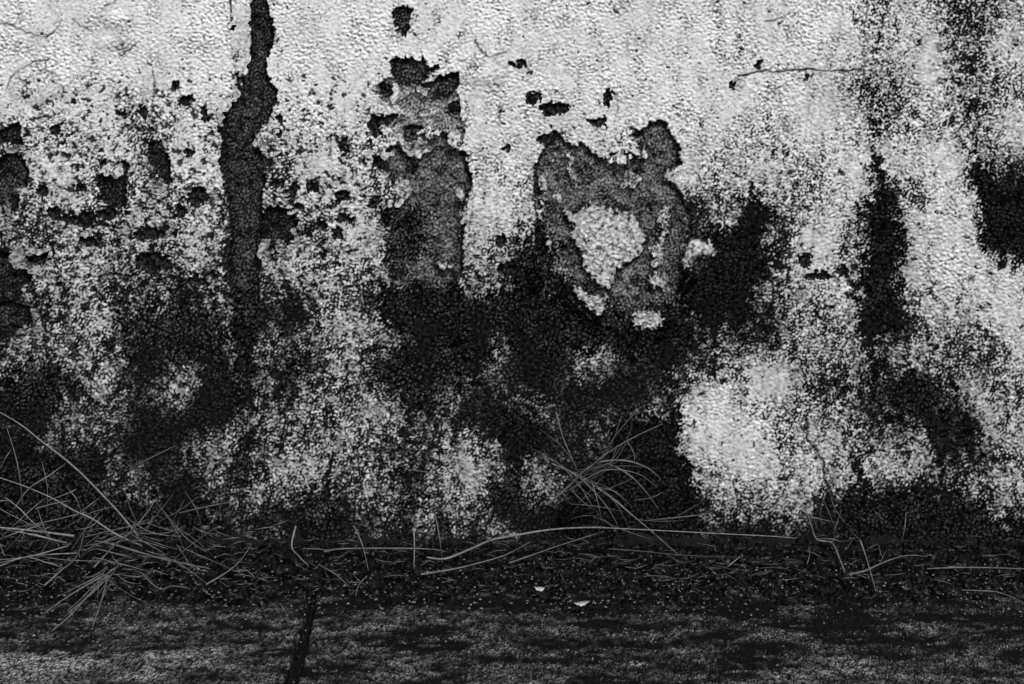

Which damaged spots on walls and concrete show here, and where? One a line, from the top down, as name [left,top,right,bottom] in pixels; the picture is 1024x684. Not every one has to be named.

flaking render [0,121,173,247]
damp [0,353,220,542]
peeling [115,104,148,119]
peeling [128,223,171,275]
damp [102,289,312,494]
damp [296,424,346,542]
flaking render [367,51,474,288]
damp [375,181,779,541]
flaking render [527,119,694,330]
crack [739,67,864,76]
damp [803,0,1024,541]